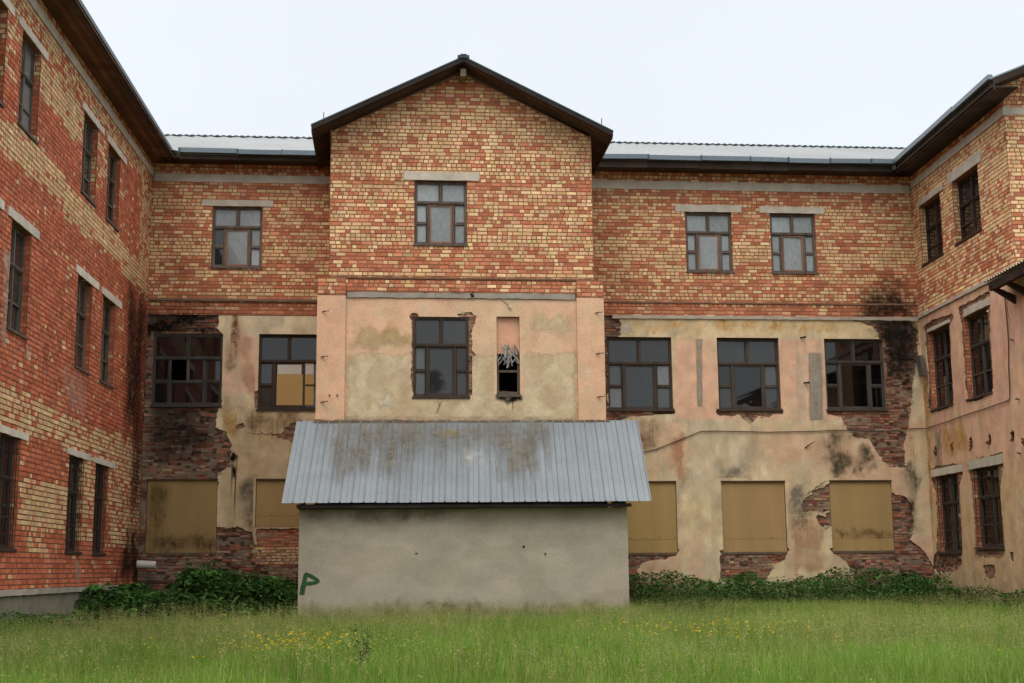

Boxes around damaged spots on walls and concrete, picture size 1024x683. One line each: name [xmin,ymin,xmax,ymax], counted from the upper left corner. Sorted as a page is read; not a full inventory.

peeling [345,311,577,421]
flaking render [827,292,993,468]
flaking render [137,315,299,592]
leakage [828,434,871,475]
flaking render [932,436,1003,528]
flaking render [628,549,679,597]
flaking render [719,548,789,583]
flaking render [830,493,962,602]